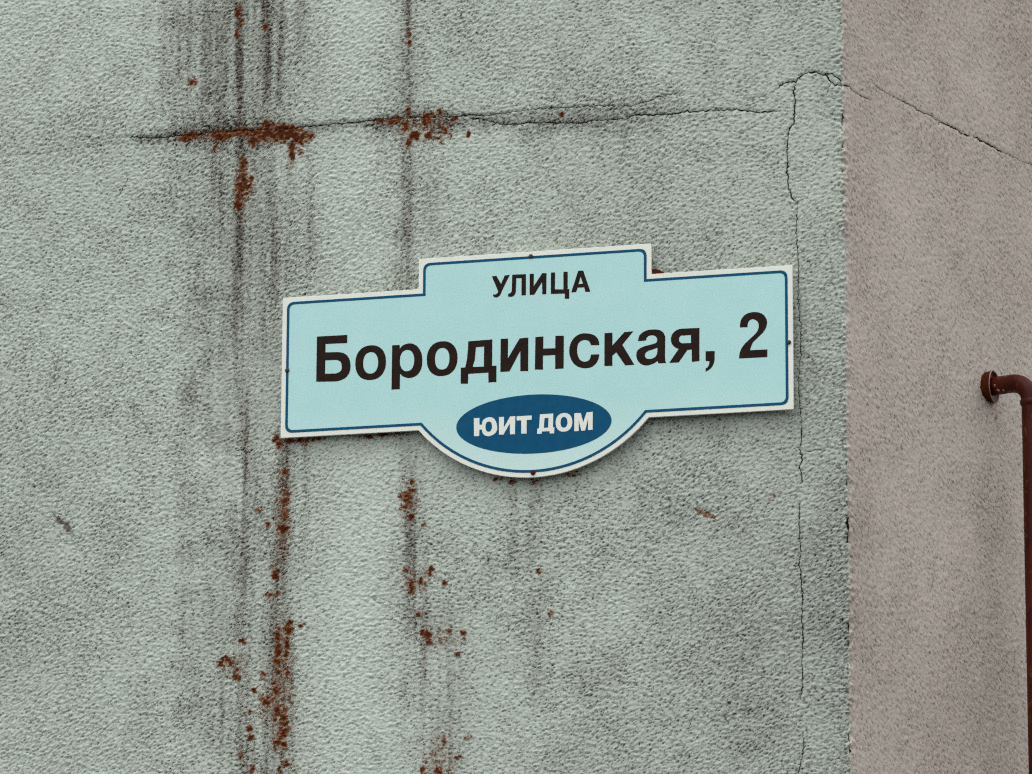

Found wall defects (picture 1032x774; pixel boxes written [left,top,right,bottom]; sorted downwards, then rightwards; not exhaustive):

leakage [135,0,336,319]
rust [179,120,315,211]
rust [372,106,458,147]
leakage [356,102,618,135]
crack [8,71,1031,694]
rust [254,470,291,598]
leakage [270,438,290,716]
rust [397,479,426,526]
rust [400,565,448,593]
rust [216,638,246,681]
rust [237,620,305,774]
rust [419,627,466,656]